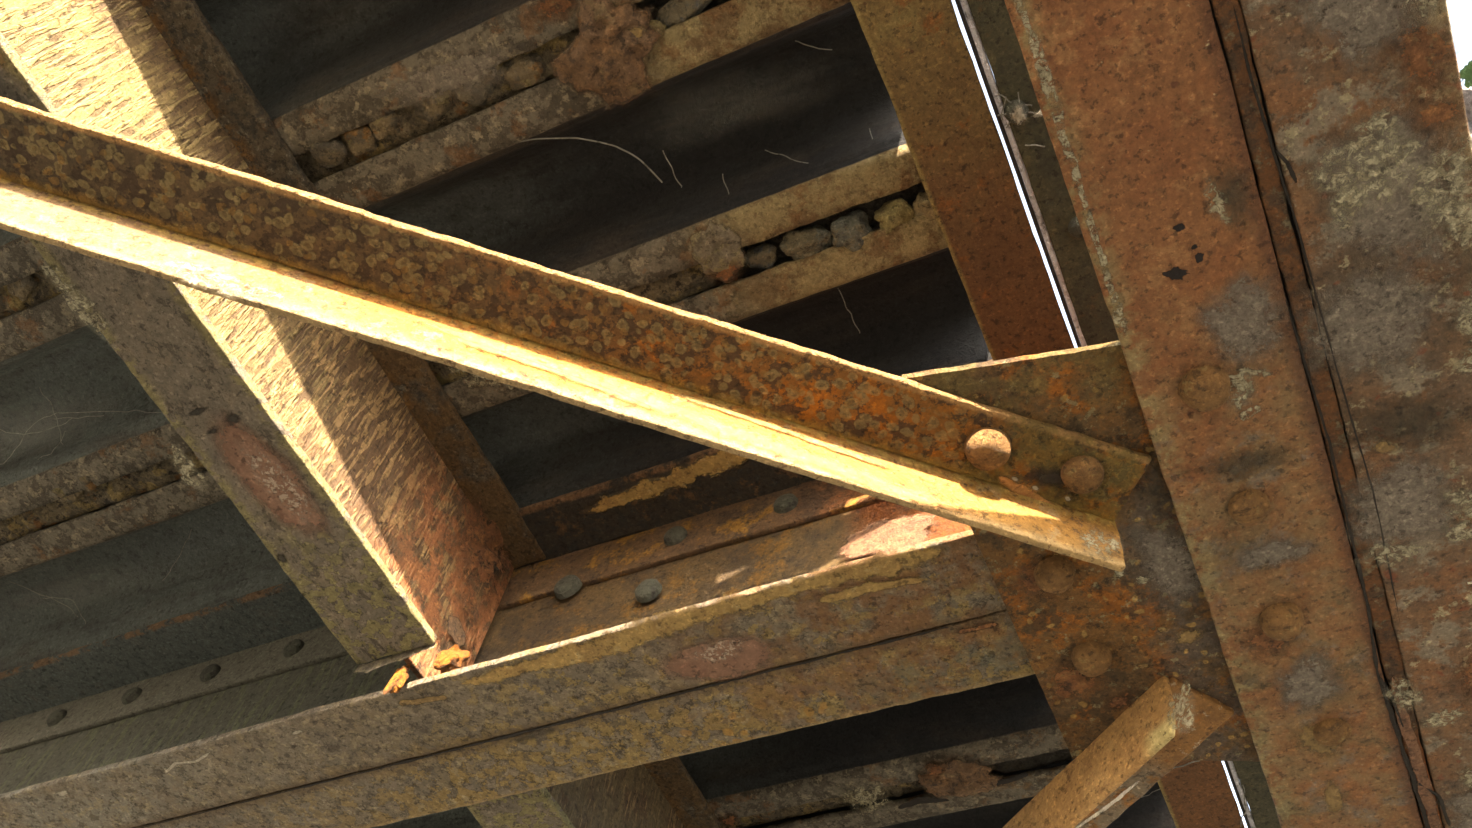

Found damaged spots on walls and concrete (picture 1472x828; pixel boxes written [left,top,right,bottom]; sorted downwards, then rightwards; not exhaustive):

corrosion [1390,19,1453,84]
corrosion [426,323,961,558]
corrosion [999,476,1070,505]
peeling [463,547,941,685]